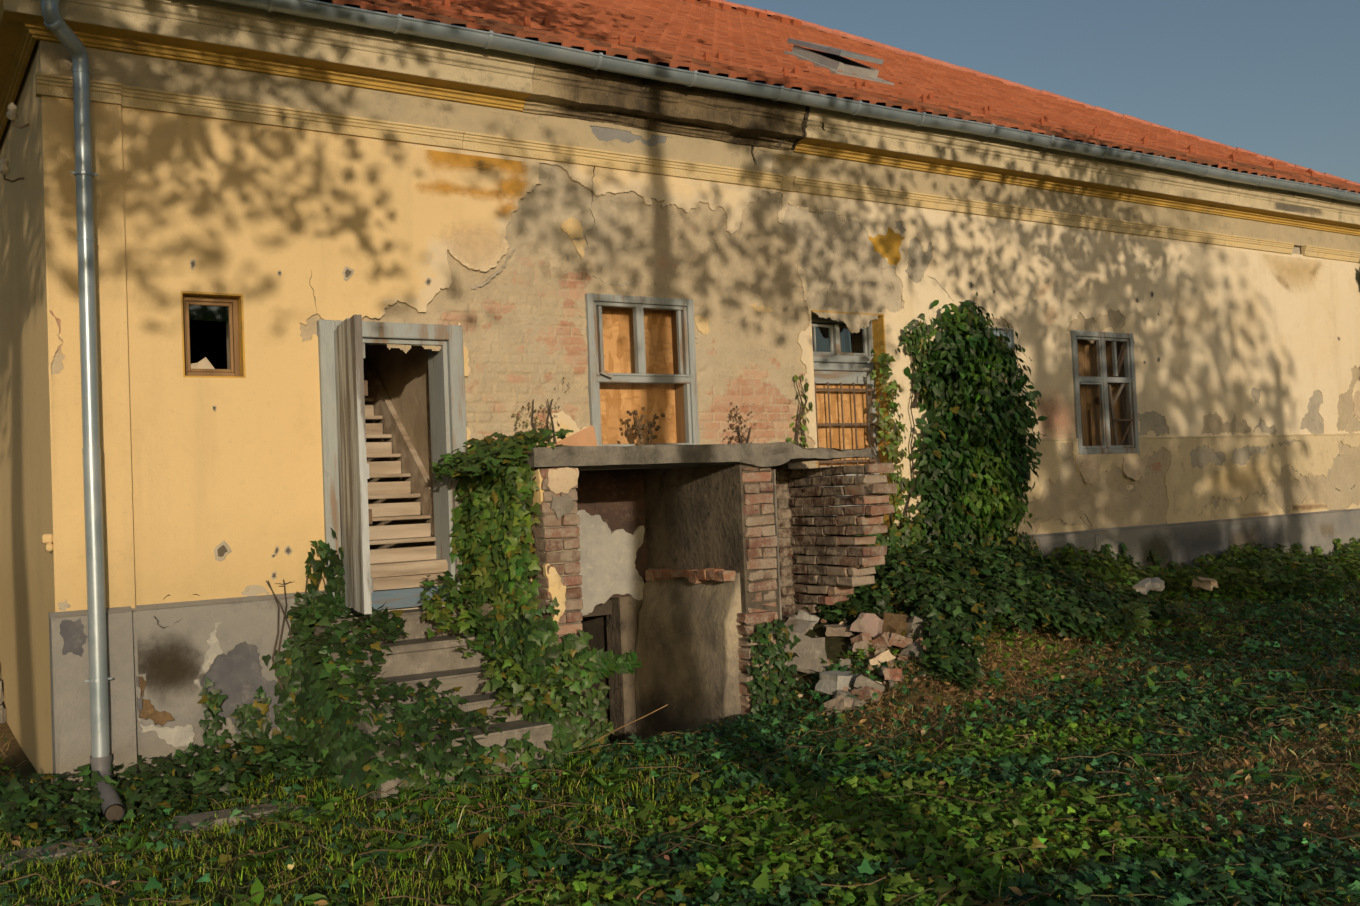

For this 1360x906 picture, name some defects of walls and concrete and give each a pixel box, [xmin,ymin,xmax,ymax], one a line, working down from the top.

crack [751,109,844,166]
spalling [342,266,354,281]
spalling [300,314,323,342]
spalling [362,163,933,487]
spalling [1067,309,1125,343]
spalling [1190,366,1360,515]
spalling [136,676,174,726]
water stain [141,645,198,689]
spalling [200,642,284,737]